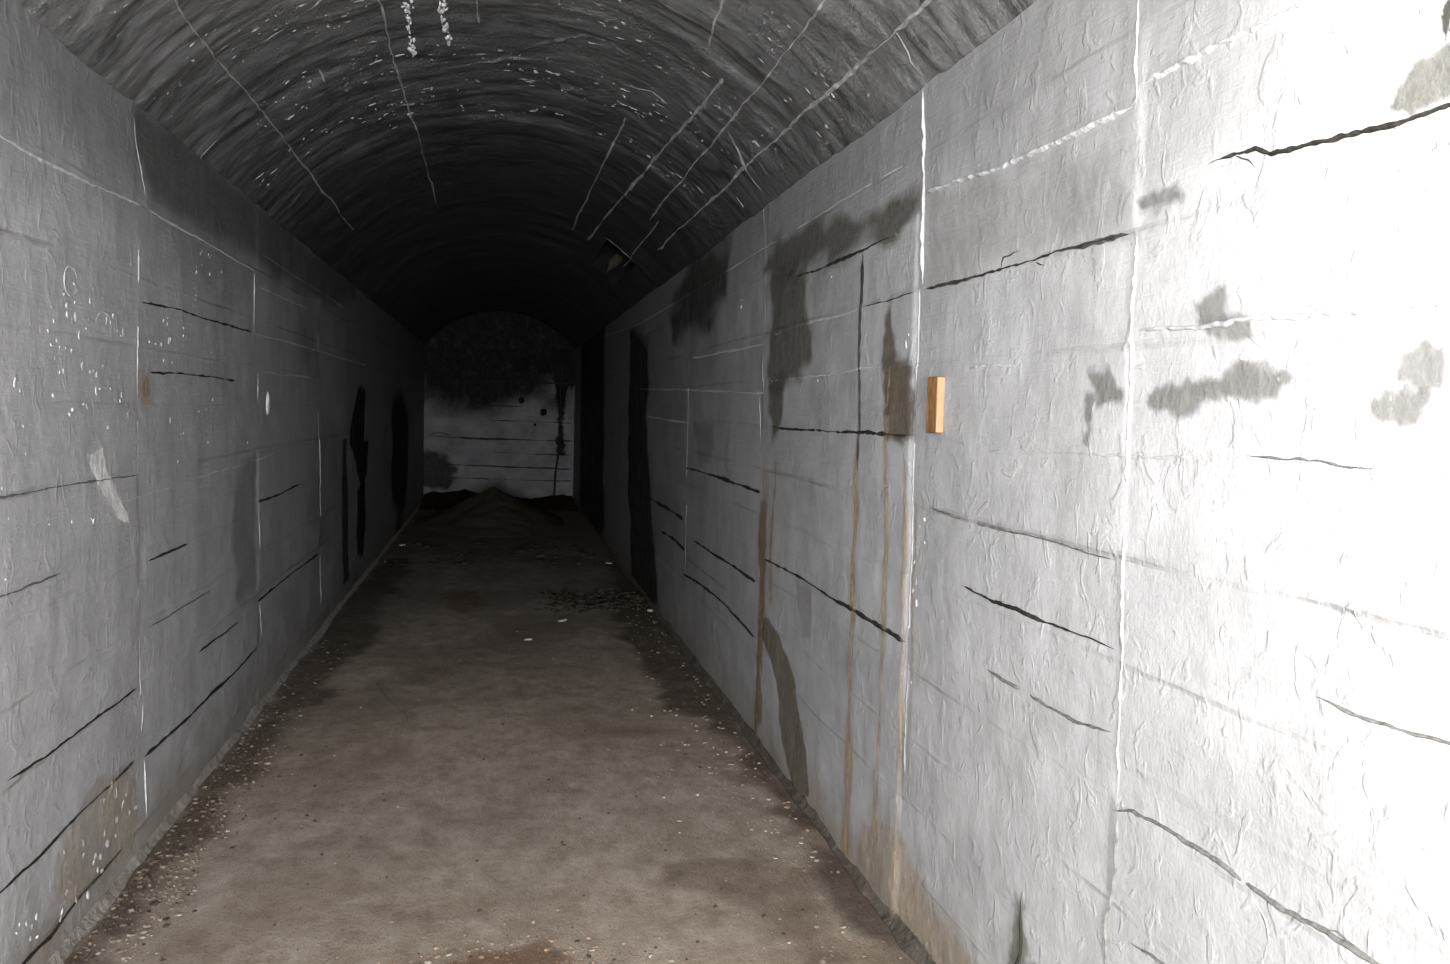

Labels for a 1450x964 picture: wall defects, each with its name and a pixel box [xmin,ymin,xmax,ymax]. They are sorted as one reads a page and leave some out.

crack [1209,103,1450,166]
spalling [1391,0,1450,115]
damp [766,196,918,441]
damp [1148,362,1290,417]
damp [1372,340,1443,425]
damp [608,330,818,830]
corrosion [755,475,776,724]
corrosion [843,462,858,855]
corrosion [873,378,906,842]
crack [962,585,1113,649]
crack [1313,691,1450,745]
crack [1103,809,1380,964]